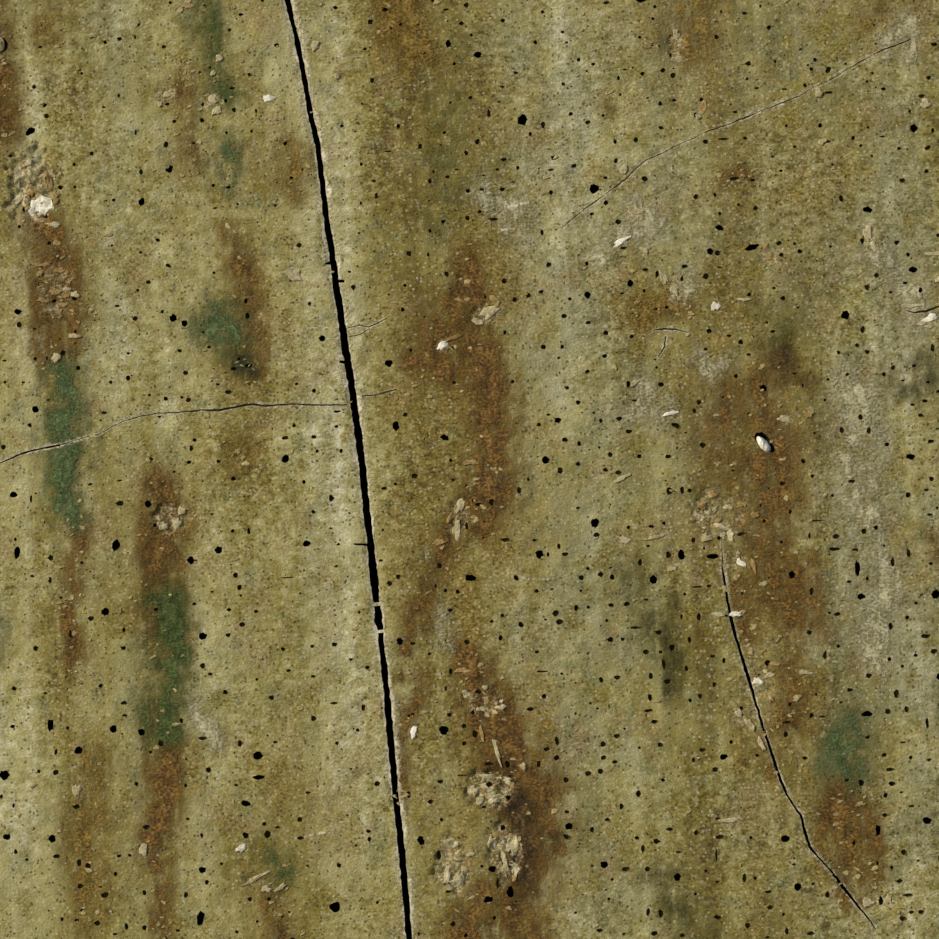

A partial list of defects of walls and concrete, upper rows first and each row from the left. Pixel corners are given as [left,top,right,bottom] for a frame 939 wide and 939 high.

corrosion [374,0,442,72]
corrosion [10,210,86,374]
corrosion [135,473,194,640]
crack [0,0,414,939]
corrosion [394,242,518,683]
corrosion [137,742,185,939]
corrosion [396,670,432,808]
corrosion [446,633,577,939]
crack [720,529,877,930]